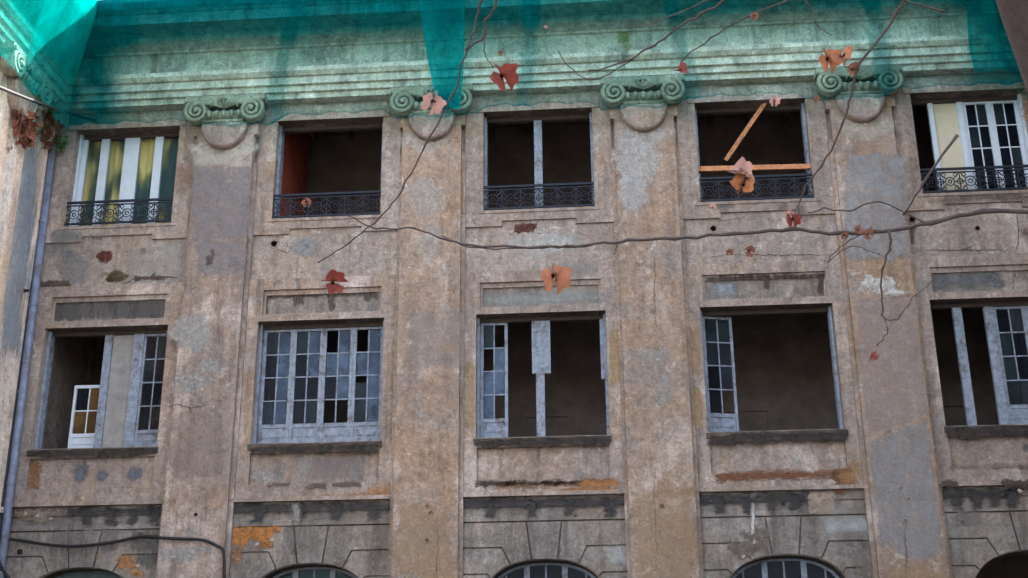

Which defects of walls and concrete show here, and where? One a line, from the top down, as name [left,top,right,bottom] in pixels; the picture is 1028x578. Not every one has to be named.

flaking render [510,223,541,234]
peeling [858,274,910,297]
flaking render [28,460,44,490]
flaking render [231,526,281,565]
flaking render [116,554,144,577]